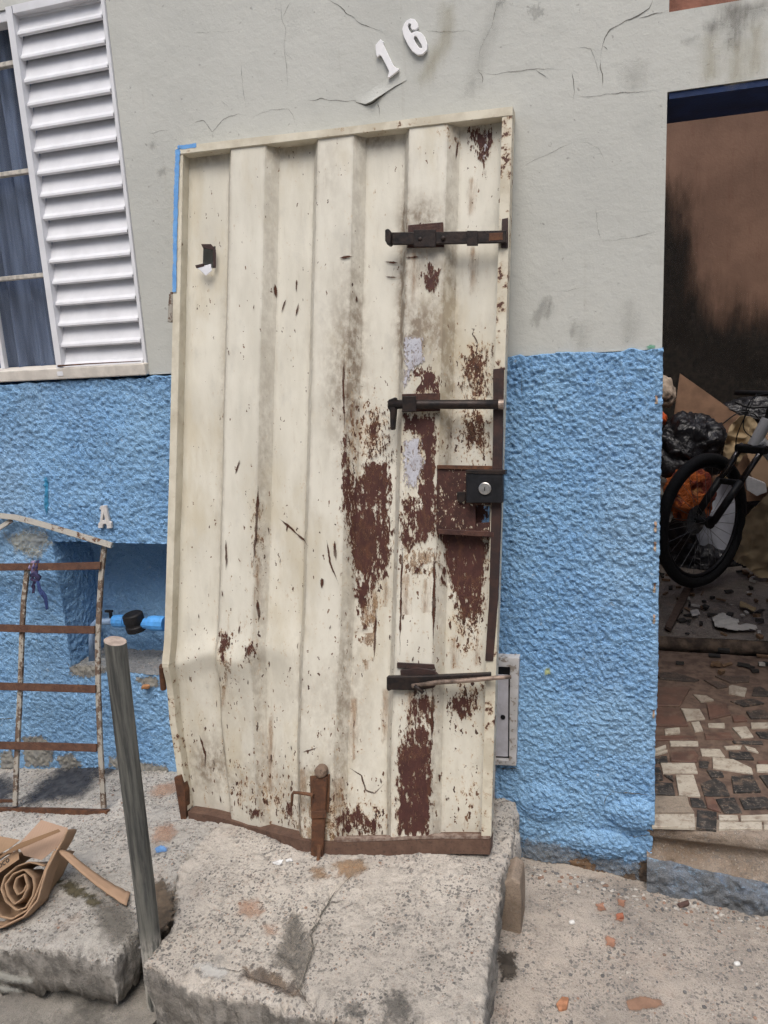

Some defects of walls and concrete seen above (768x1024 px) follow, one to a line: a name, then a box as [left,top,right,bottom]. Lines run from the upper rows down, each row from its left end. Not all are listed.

flaking render [352,69,407,106]
crack [572,3,662,97]
crack [200,879,348,1005]